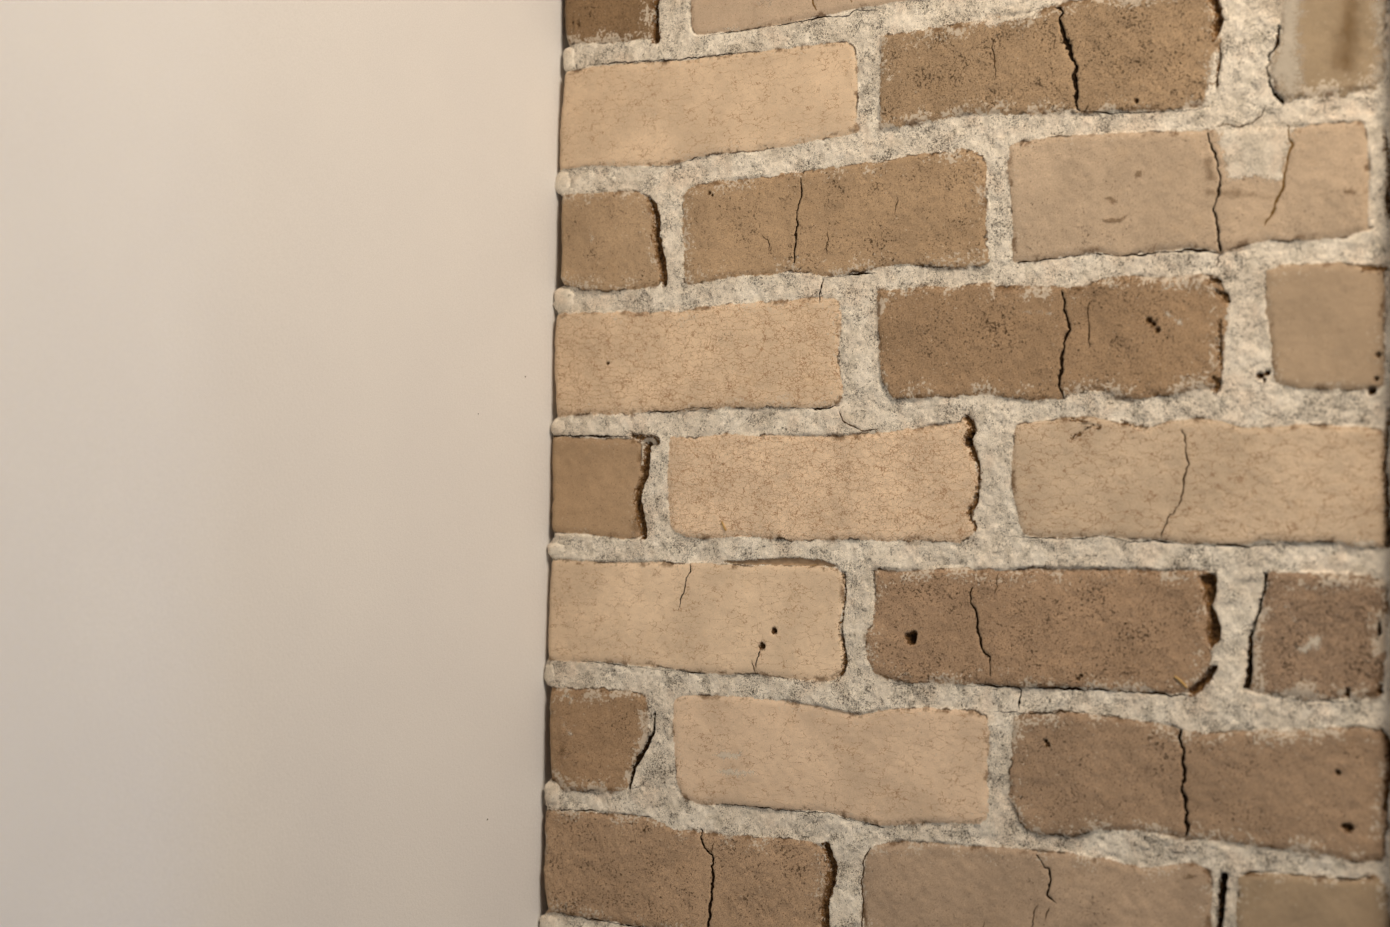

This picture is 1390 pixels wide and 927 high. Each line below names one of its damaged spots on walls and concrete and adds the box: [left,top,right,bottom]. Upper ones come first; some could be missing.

crack [762,177,873,303]
crack [1018,7,1294,398]
crack [1009,428,1275,548]
crack [967,574,1190,716]
crack [1178,730,1190,837]
crack [700,829,715,927]
crack [734,804,886,927]